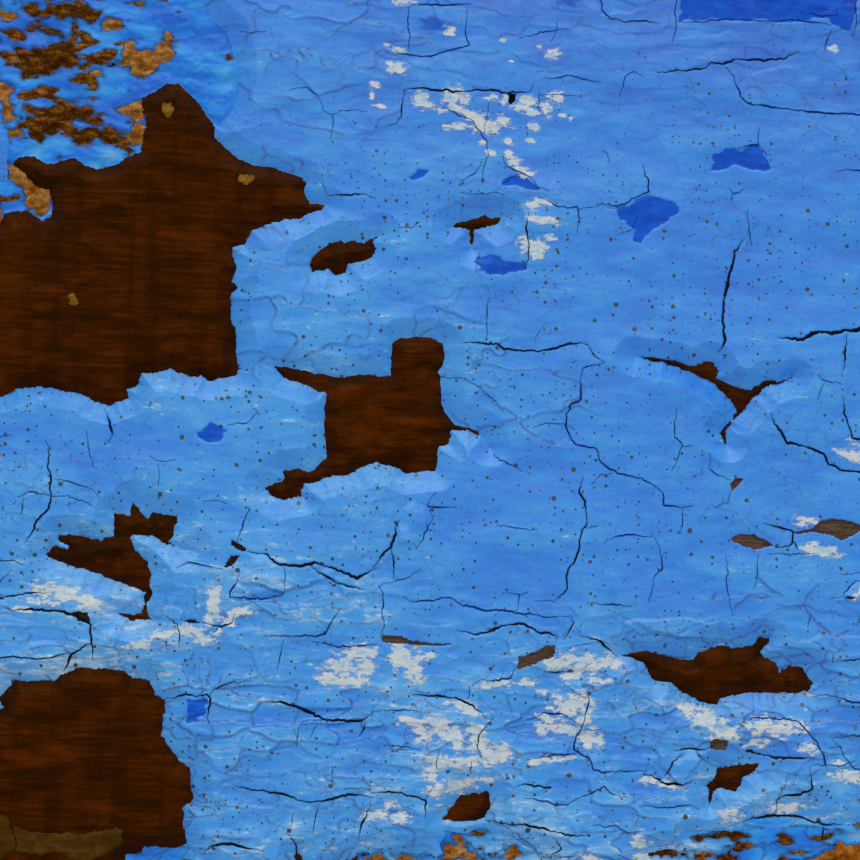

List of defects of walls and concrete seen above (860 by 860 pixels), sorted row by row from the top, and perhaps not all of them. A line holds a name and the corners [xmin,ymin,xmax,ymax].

peeling [0,2,121,79]
water stain [410,83,573,179]
peeling [0,83,511,520]
crack [778,327,860,440]
crack [179,298,690,669]
crack [0,559,93,672]
peeling [0,480,215,860]
water stain [313,642,436,689]
crack [265,665,519,774]
water stain [396,699,577,799]
water stain [477,648,625,750]
peeling [598,618,846,728]